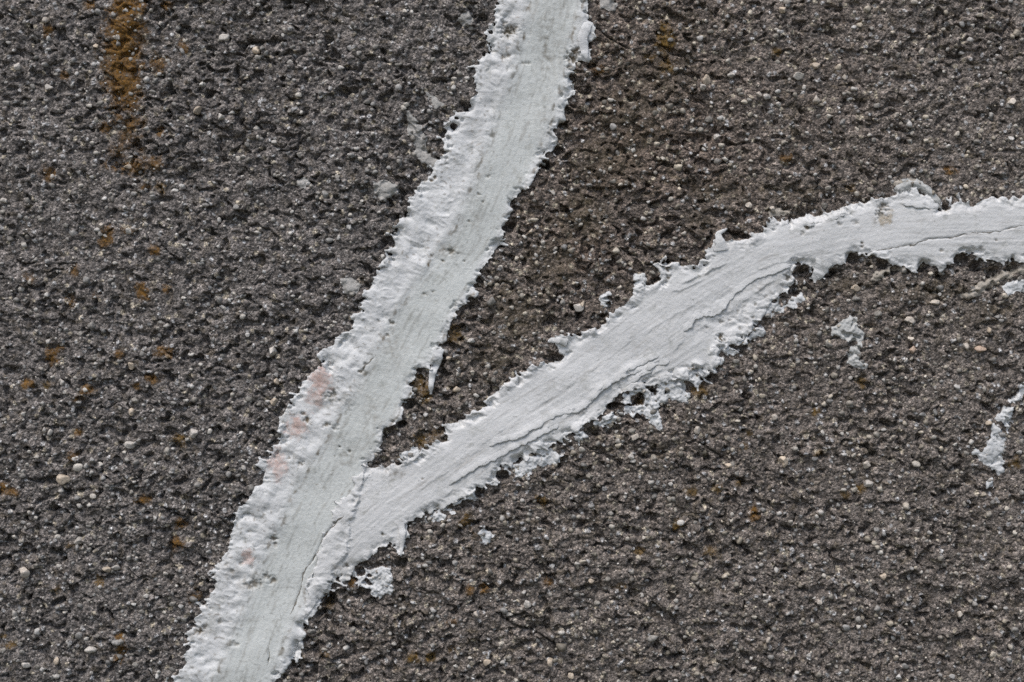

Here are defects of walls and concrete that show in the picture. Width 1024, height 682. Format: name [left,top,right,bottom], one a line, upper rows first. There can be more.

rust [101,0,148,131]
crack [165,0,596,682]
crack [302,178,1024,619]